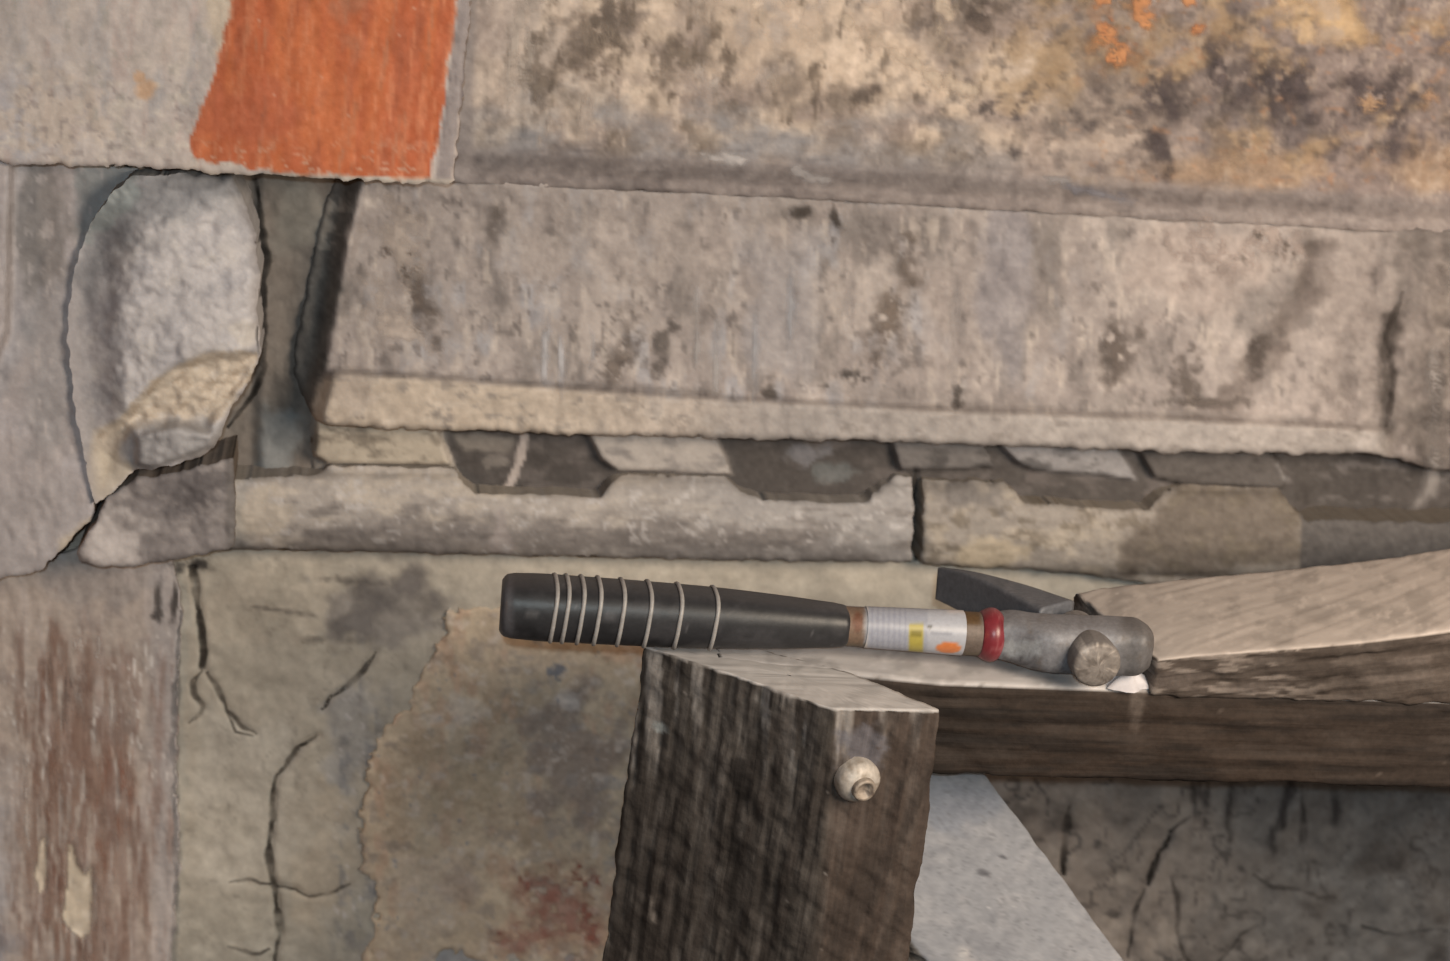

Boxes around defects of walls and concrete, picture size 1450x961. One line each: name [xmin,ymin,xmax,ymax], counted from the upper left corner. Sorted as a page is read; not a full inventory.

crack [174,564,249,733]
crack [321,652,376,710]
crack [253,741,349,961]
flaking render [358,607,644,961]
crack [1127,825,1245,961]